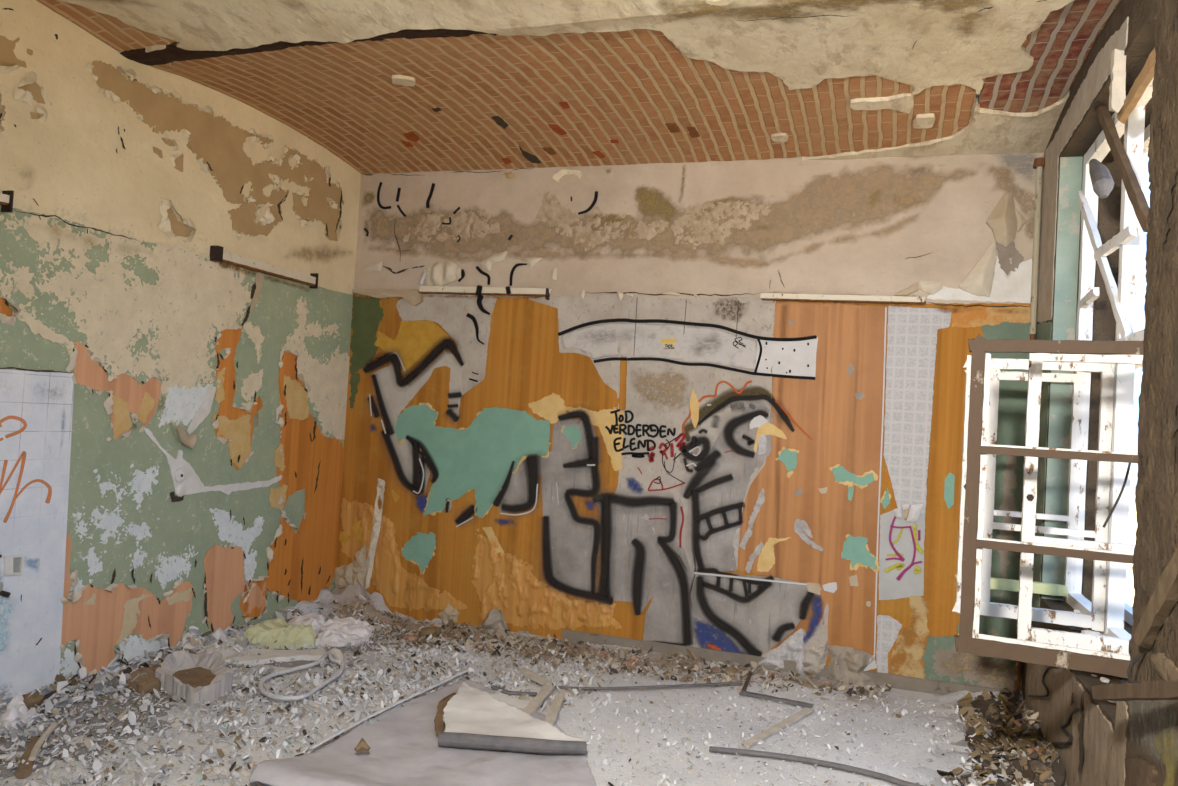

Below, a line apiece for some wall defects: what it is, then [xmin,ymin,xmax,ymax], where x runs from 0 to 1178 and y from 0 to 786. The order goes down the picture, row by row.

peeling [0,35,52,136]
flaking render [36,0,177,52]
flaking render [85,0,1121,242]
leakage [364,165,973,267]
leakage [991,168,1035,237]
peeling [0,188,265,448]
peeling [282,296,350,440]
flaking render [1128,0,1178,683]
peeling [67,459,198,605]
peeling [209,444,288,585]
peeling [364,478,385,590]
flaking render [996,455,1019,601]